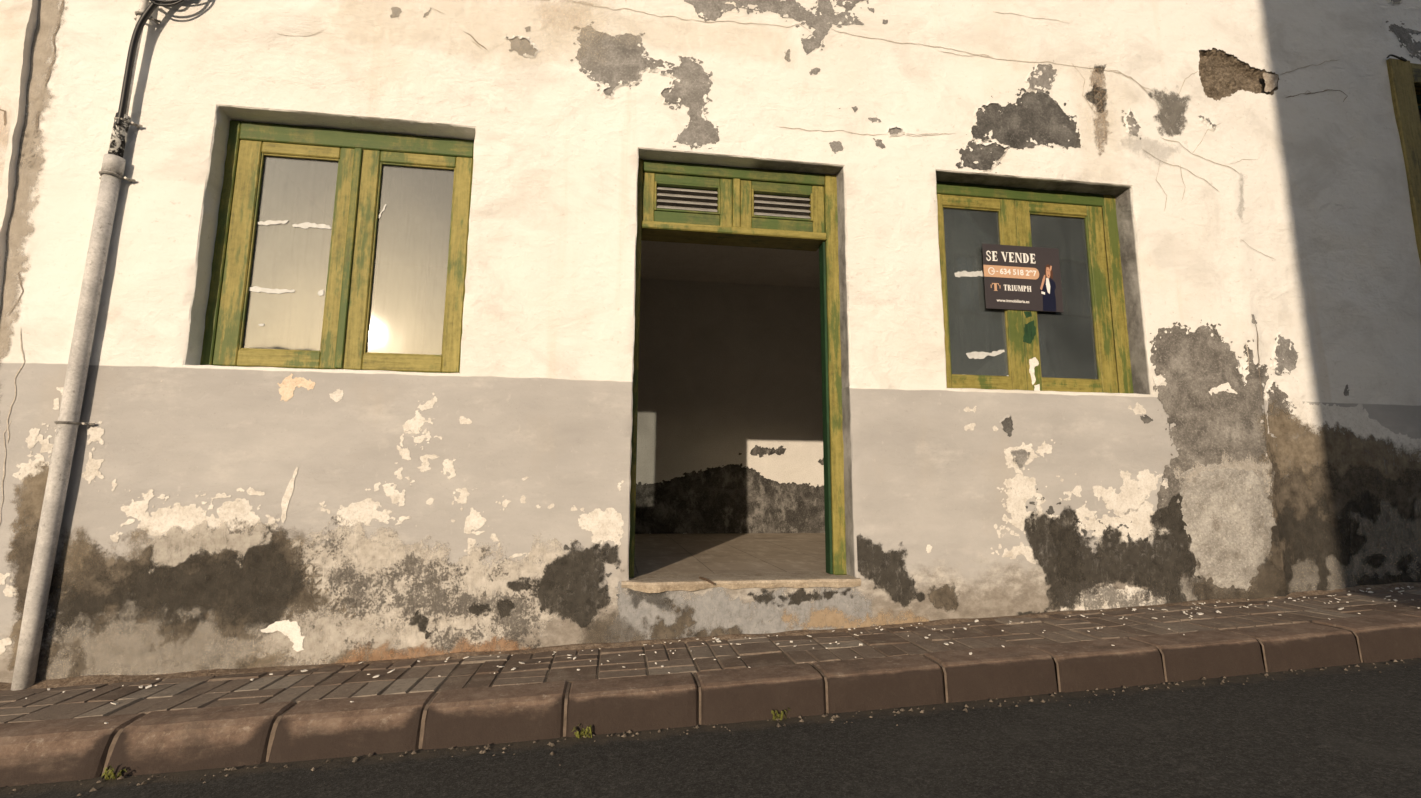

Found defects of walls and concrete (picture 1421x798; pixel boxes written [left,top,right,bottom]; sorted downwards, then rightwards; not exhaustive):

peeling [570,21,719,149]
peeling [684,0,888,75]
peeling [956,60,1081,173]
spalling [1199,48,1279,101]
damp [7,462,49,671]
peeling [12,387,64,482]
peeling [82,421,280,543]
damp [38,517,958,681]
damp [1019,493,1200,615]
peeling [990,314,1421,564]
peeling [1060,542,1420,635]
damp [1259,400,1421,596]